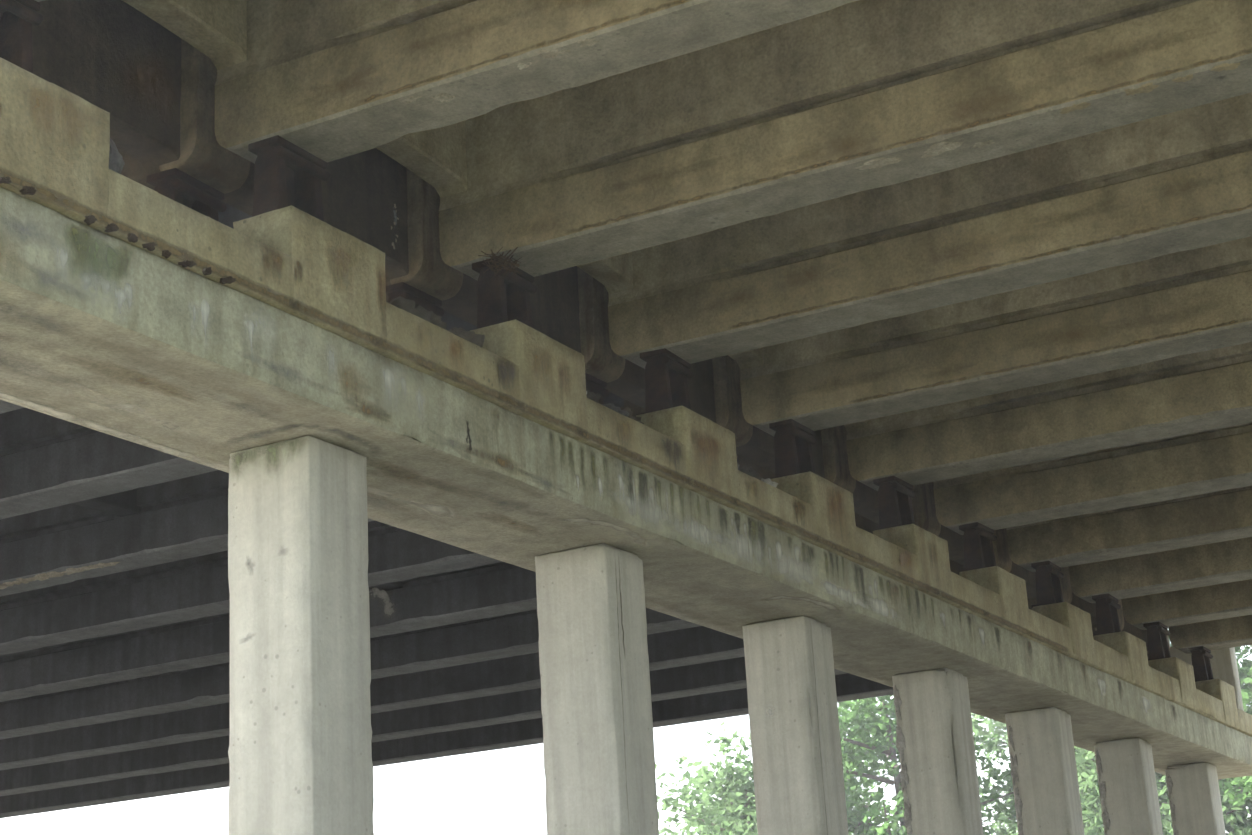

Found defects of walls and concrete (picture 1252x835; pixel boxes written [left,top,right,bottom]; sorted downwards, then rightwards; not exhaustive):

damp [0,169,1067,657]
crack [616,581,625,687]